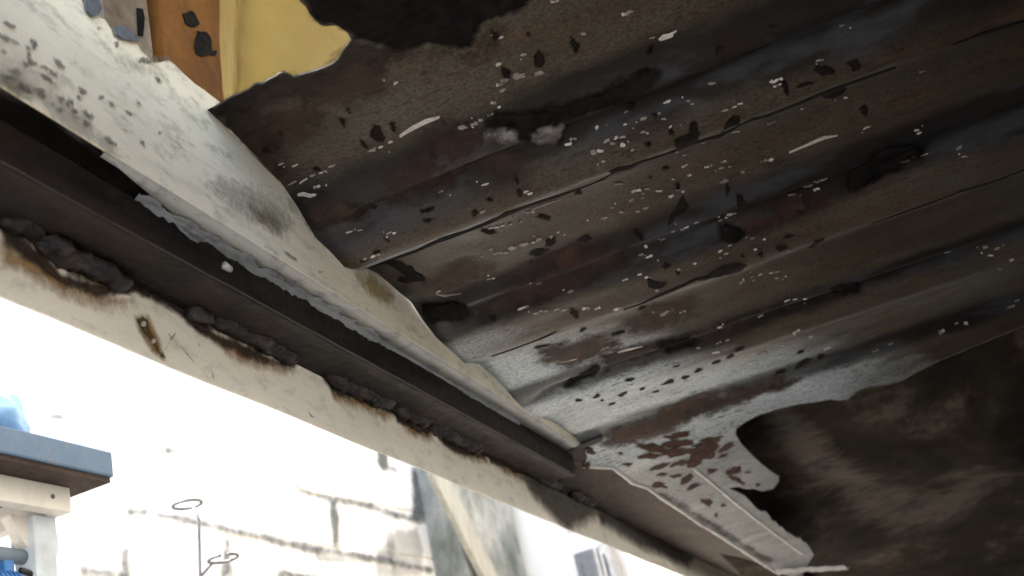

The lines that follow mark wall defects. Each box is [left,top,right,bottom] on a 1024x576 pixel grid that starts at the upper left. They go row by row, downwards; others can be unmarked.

peeling [646,30,677,54]
spalling [0,21,174,215]
spalling [359,116,439,153]
spalling [458,50,545,130]
peeling [789,135,838,154]
spalling [287,164,335,198]
spalling [587,97,706,275]
spalling [360,231,426,283]
rust [137,317,165,358]
rust [538,298,783,389]
spalling [575,324,768,406]
spalling [582,431,760,491]